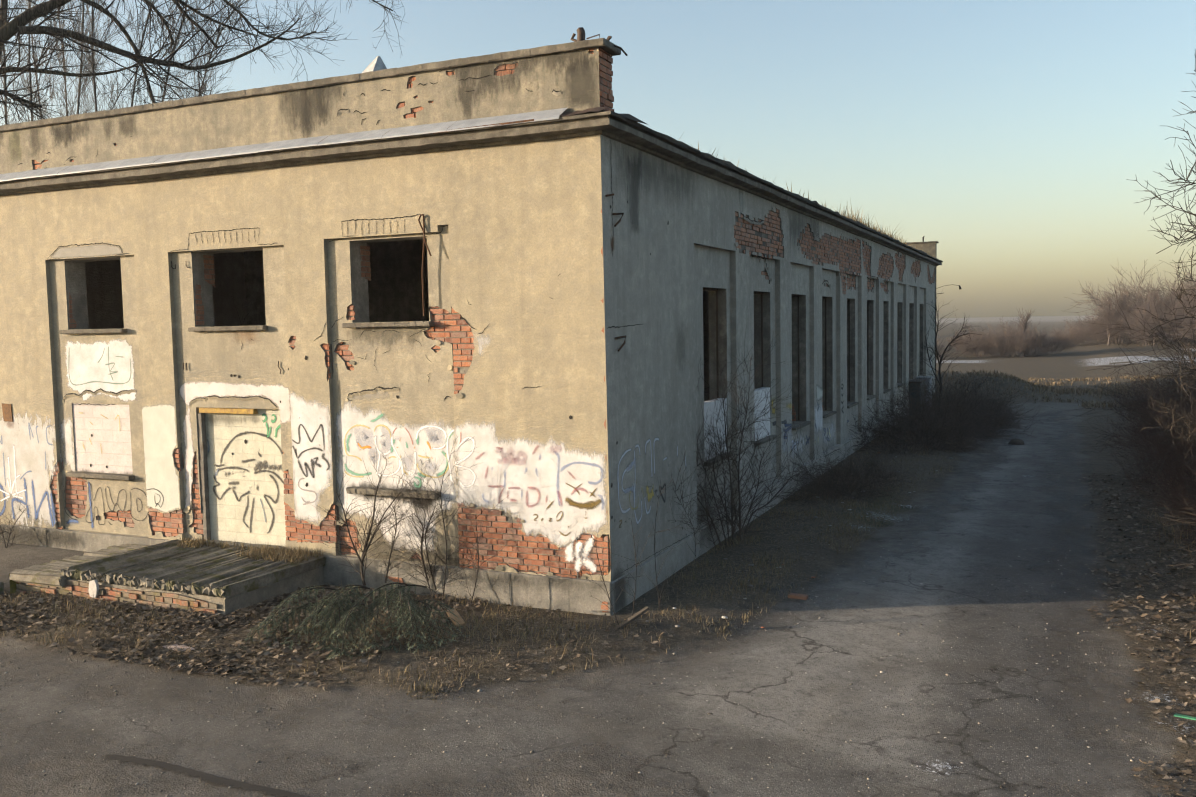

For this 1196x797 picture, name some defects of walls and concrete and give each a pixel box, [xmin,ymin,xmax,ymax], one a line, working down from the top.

spalling [397,77,433,119]
damp [456,50,594,114]
spalling [734,206,936,294]
spalling [418,214,475,398]
spalling [51,447,203,537]
spalling [283,470,361,556]
spalling [457,502,612,580]